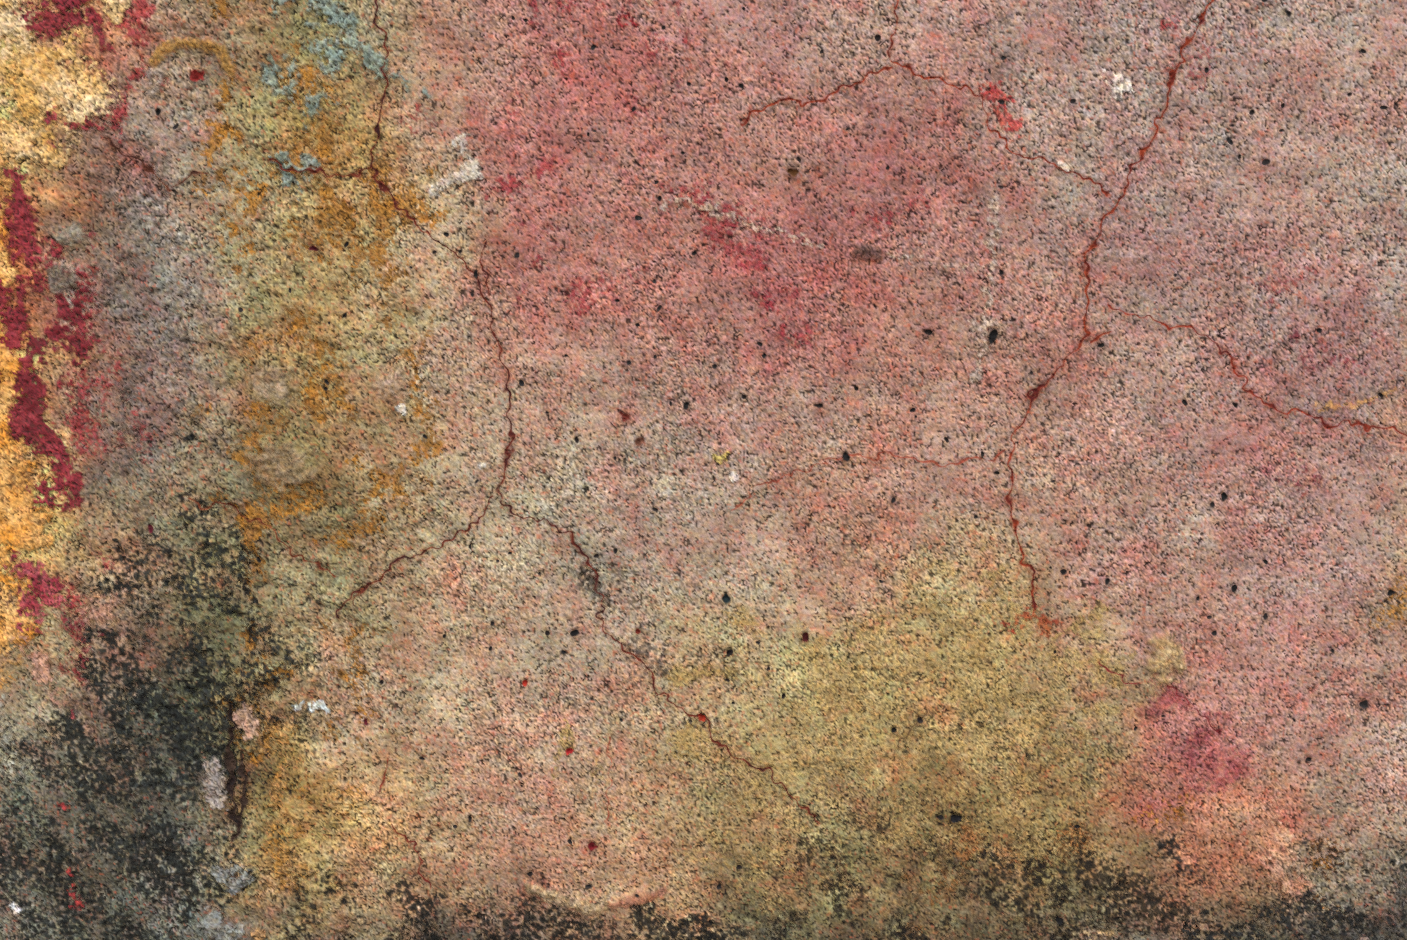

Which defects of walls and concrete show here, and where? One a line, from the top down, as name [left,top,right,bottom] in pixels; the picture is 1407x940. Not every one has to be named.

crack [188,0,854,890]
crack [734,0,1407,613]
damp [0,477,369,940]
damp [382,545,1407,940]
crack [892,705,928,758]
crack [1098,661,1222,735]